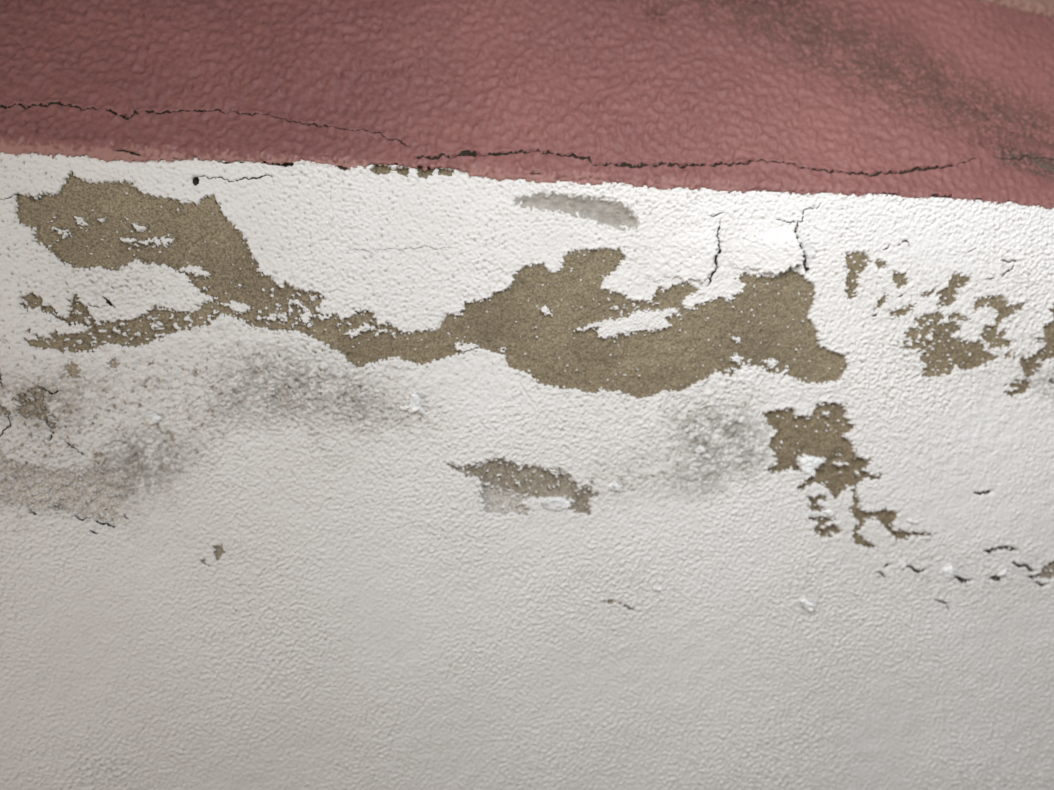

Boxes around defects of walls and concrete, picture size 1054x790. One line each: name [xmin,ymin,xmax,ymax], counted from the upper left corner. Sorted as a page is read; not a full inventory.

crack [0,101,1053,177]
flaking render [15,172,848,399]
crack [708,212,725,286]
peeling [845,251,1054,397]
flaking render [0,387,56,432]
flaking render [447,458,623,516]
flaking render [762,402,930,549]
flaking render [1034,562,1054,579]